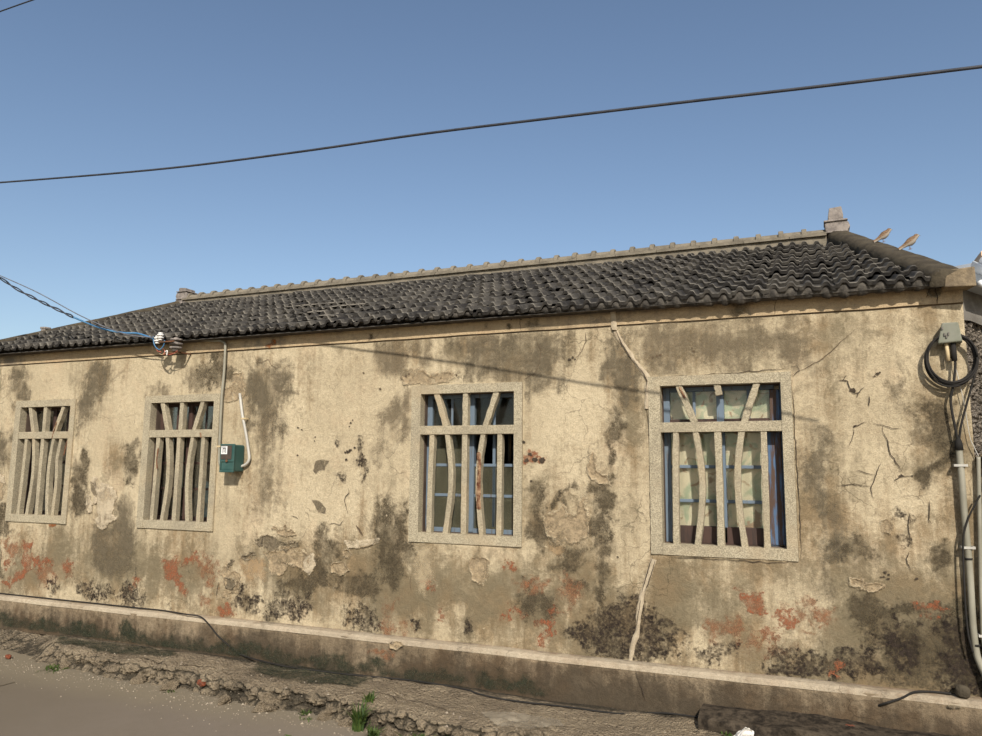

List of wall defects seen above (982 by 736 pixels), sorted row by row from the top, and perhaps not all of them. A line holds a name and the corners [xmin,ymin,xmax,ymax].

water stain [449,319,570,401]
flaking render [85,476,117,531]
water stain [76,438,146,607]
flaking render [161,524,316,617]
water stain [234,498,431,632]
flaking render [522,440,545,465]
water stain [525,303,808,666]
crack [610,312,850,697]
crack [836,376,907,500]
crack [906,501,931,568]
water stain [914,401,957,489]
flaking render [703,587,830,660]